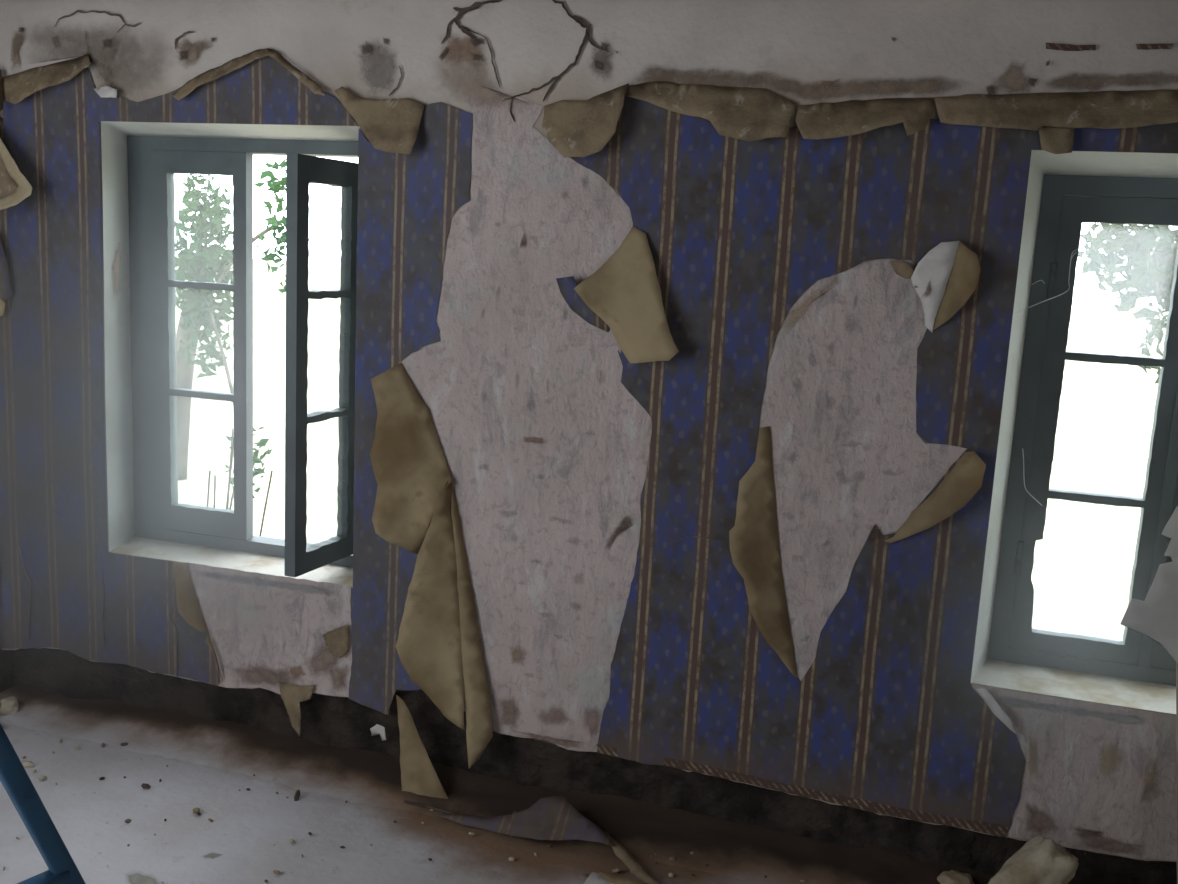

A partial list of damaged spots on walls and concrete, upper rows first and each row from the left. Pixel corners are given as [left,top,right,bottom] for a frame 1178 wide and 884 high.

crack [54,10,141,35]
flaking render [11,28,24,65]
flaking render [178,38,215,64]
flaking render [360,39,394,89]
flaking render [440,38,483,61]
crack [441,0,610,122]
flaking render [591,43,618,77]
flaking render [987,65,1037,94]
peeling [370,64,679,768]
peeling [729,241,986,681]
flaking render [0,561,1177,884]